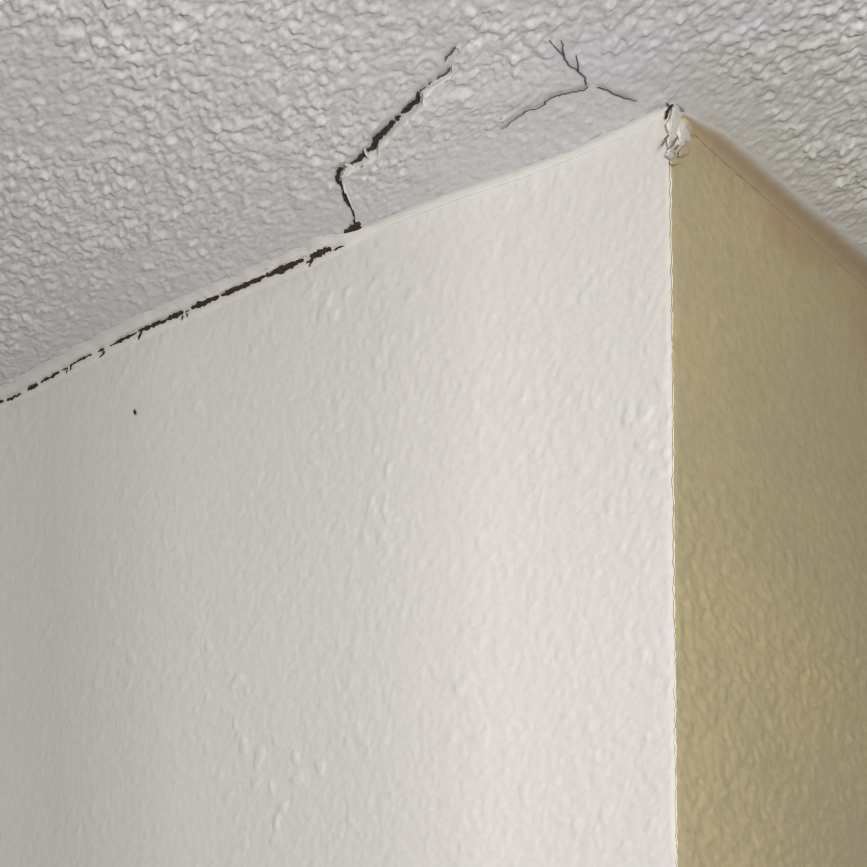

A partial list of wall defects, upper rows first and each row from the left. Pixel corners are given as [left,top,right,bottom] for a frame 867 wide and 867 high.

crack [0,46,462,403]
crack [501,40,635,129]